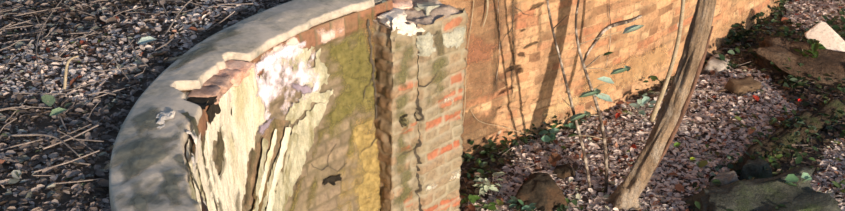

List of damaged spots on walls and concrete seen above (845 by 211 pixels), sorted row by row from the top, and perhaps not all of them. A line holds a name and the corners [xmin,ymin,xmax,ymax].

peeling [145,46,335,211]
crack [403,32,438,211]